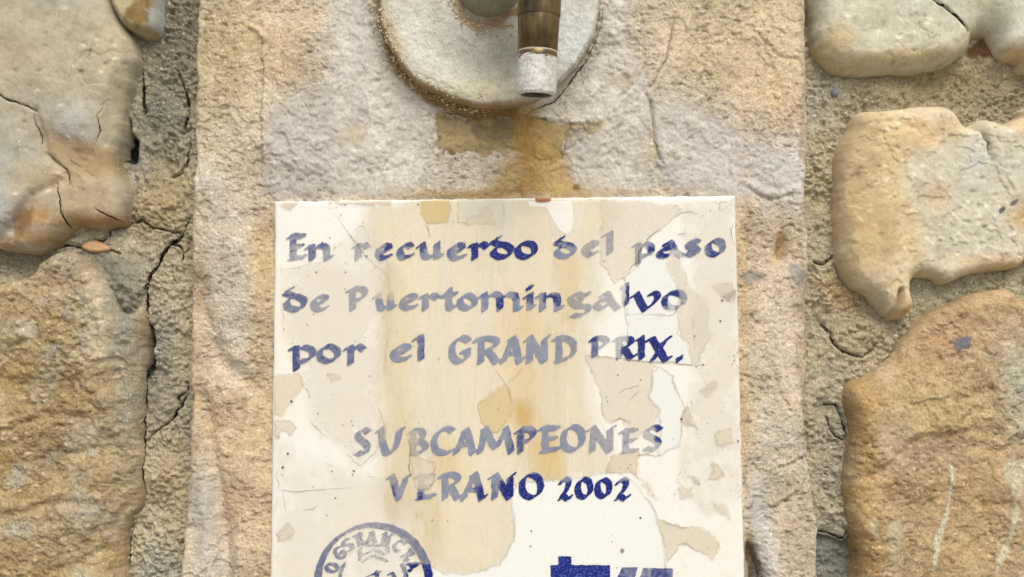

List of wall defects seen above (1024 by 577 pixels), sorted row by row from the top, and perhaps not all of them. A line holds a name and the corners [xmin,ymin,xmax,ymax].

crack [933,0,965,26]
crack [0,94,190,312]
peeling [422,200,451,224]
crack [142,337,189,495]
leakage [373,200,610,574]
peeling [432,254,725,577]